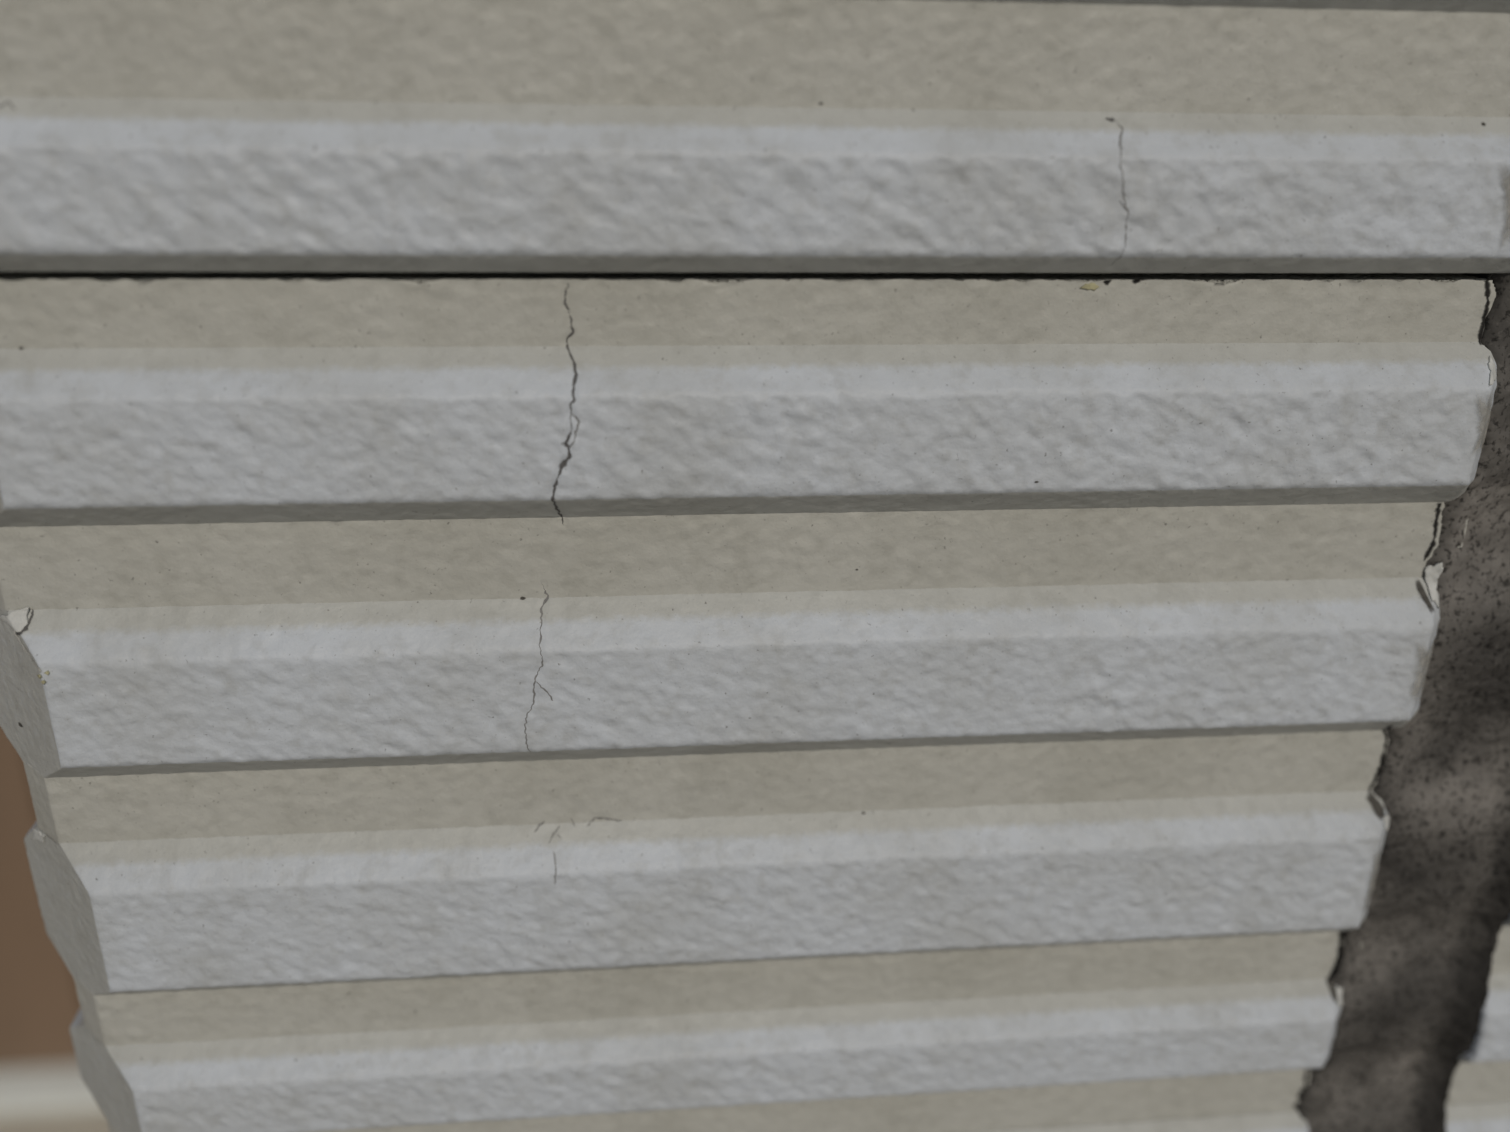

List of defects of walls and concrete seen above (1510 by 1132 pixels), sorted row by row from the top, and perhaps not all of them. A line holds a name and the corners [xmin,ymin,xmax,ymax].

crack [551,284,580,524]
peeling [1475,356,1497,449]
peeling [1417,562,1443,611]
crack [520,584,553,752]
peeling [1367,793,1390,831]
crack [534,817,620,885]
peeling [1327,976,1343,1008]